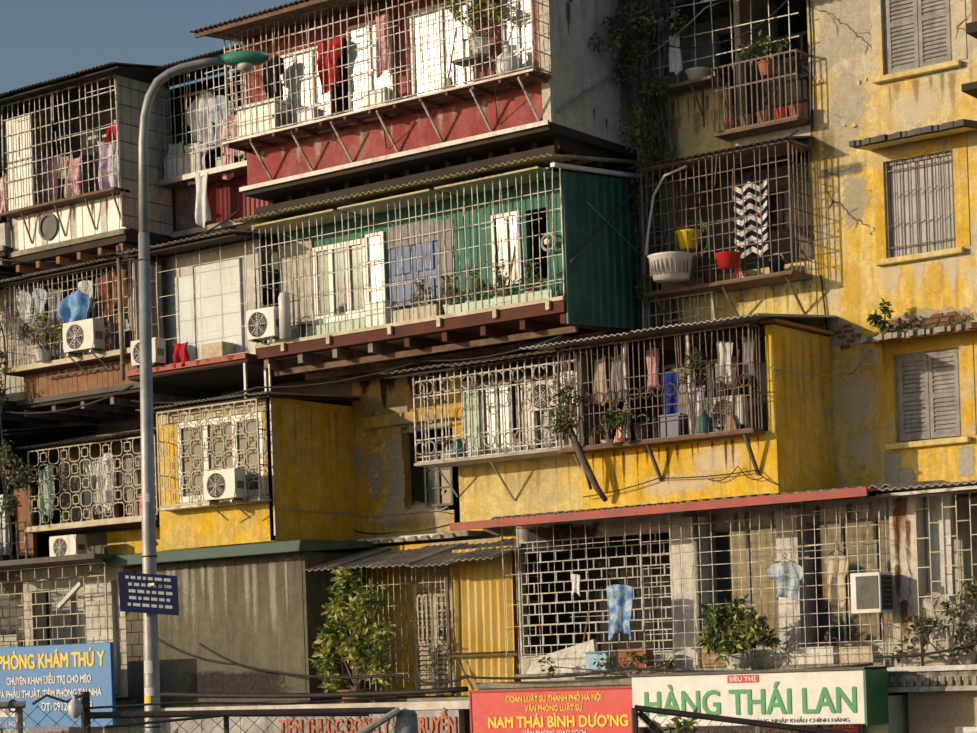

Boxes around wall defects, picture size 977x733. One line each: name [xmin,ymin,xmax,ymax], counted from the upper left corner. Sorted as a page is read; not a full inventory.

crack [811,6,872,53]
crack [814,165,870,228]
spalling [823,309,878,350]
spalling [890,306,977,331]
spalling [357,420,455,544]
rust [892,497,910,634]
damp [188,671,288,693]